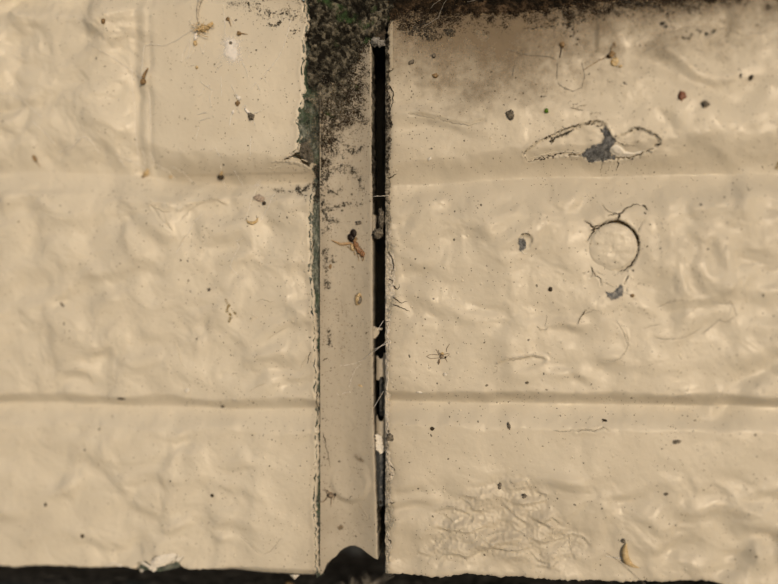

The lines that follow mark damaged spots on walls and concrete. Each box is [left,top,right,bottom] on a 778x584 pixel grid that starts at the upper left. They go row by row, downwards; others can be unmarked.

water stain [226,0,749,233]
peeling [524,104,662,173]
spalling [605,284,624,300]
spalling [138,553,184,573]